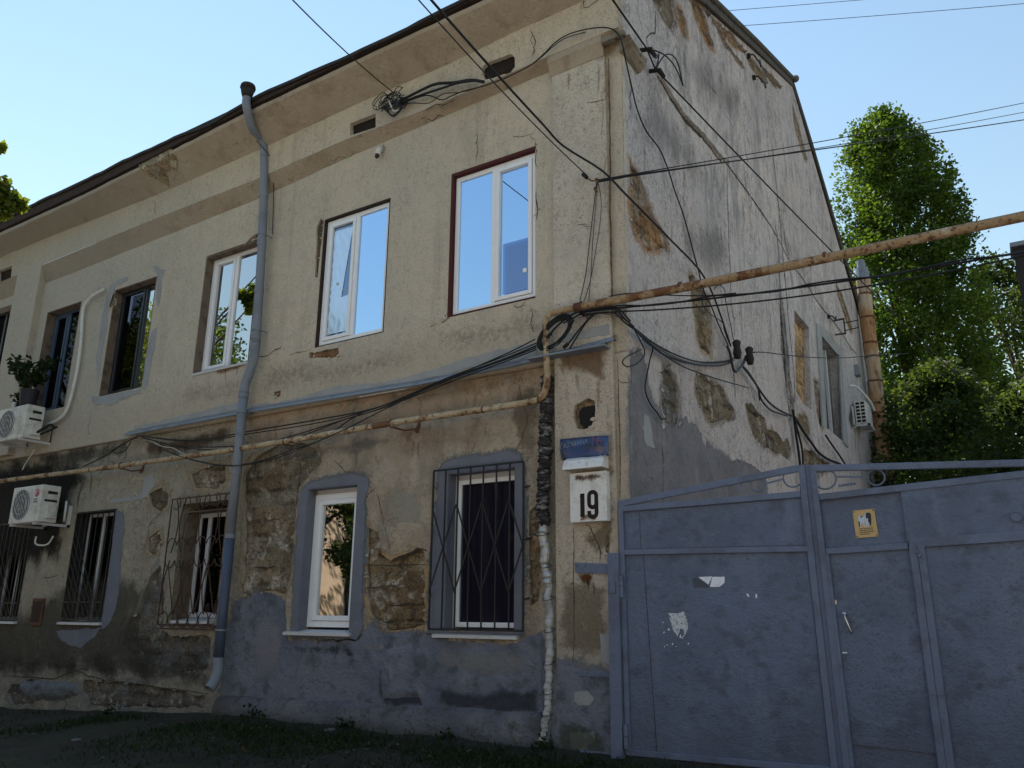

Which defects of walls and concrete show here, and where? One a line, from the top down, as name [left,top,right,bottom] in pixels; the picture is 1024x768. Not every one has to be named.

spalling [139,148,177,186]
spalling [628,159,666,253]
spalling [311,349,340,359]
spalling [659,364,681,427]
spalling [688,272,713,359]
spalling [694,371,791,459]
spalling [147,481,171,514]
spalling [186,439,324,599]
spalling [80,527,213,711]
spalling [363,523,429,633]